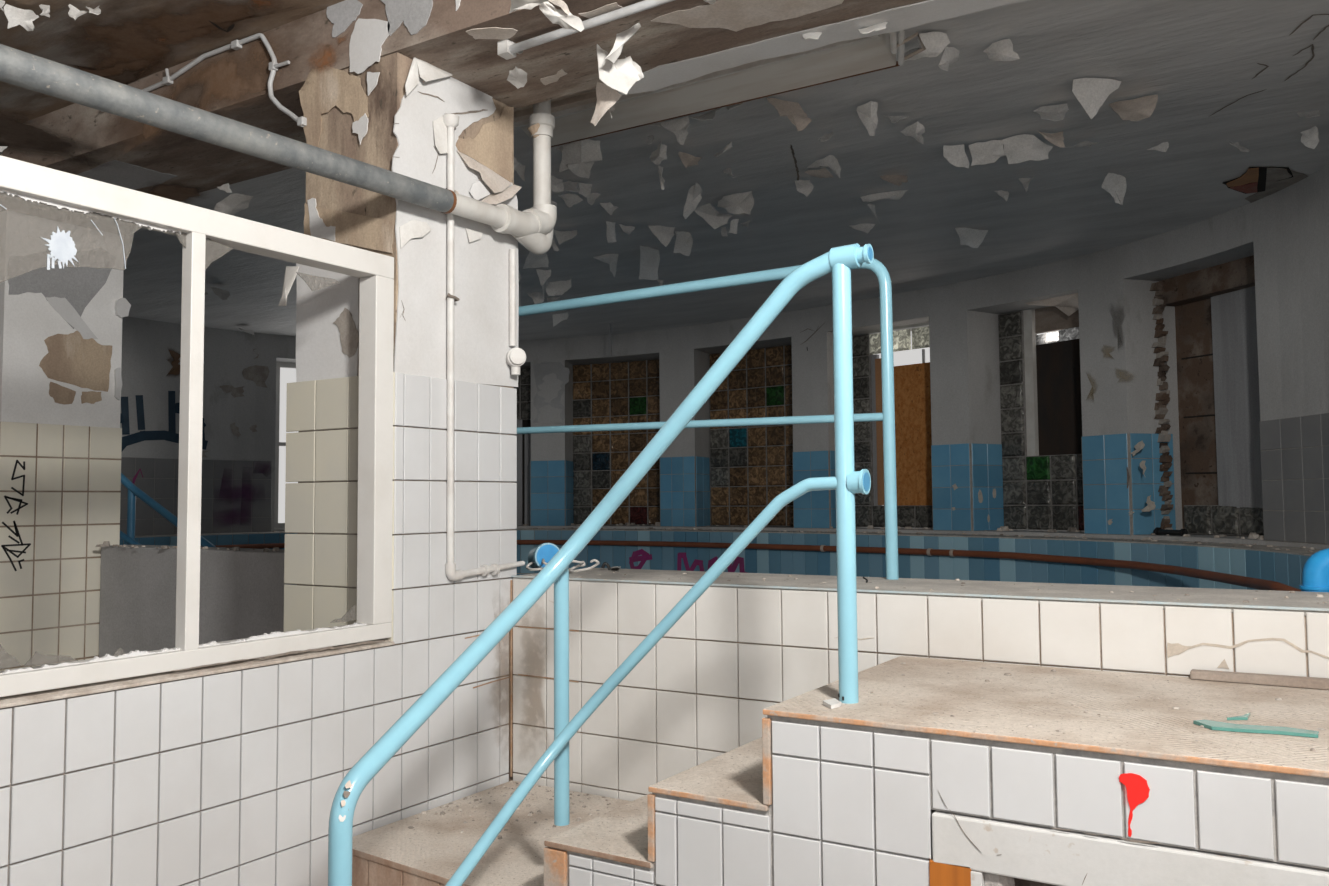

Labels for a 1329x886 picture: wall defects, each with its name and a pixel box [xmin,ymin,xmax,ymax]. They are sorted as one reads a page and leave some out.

peeling [0,0,50,31]
peeling [68,4,101,20]
peeling [299,0,433,147]
spalling [405,57,526,205]
peeling [466,0,623,40]
peeling [551,0,1030,286]
peeling [943,78,1158,205]
crack [1210,14,1329,116]
peeling [304,198,431,253]
spalling [8,265,123,405]
spalling [1127,282,1174,530]
crack [1167,638,1329,669]